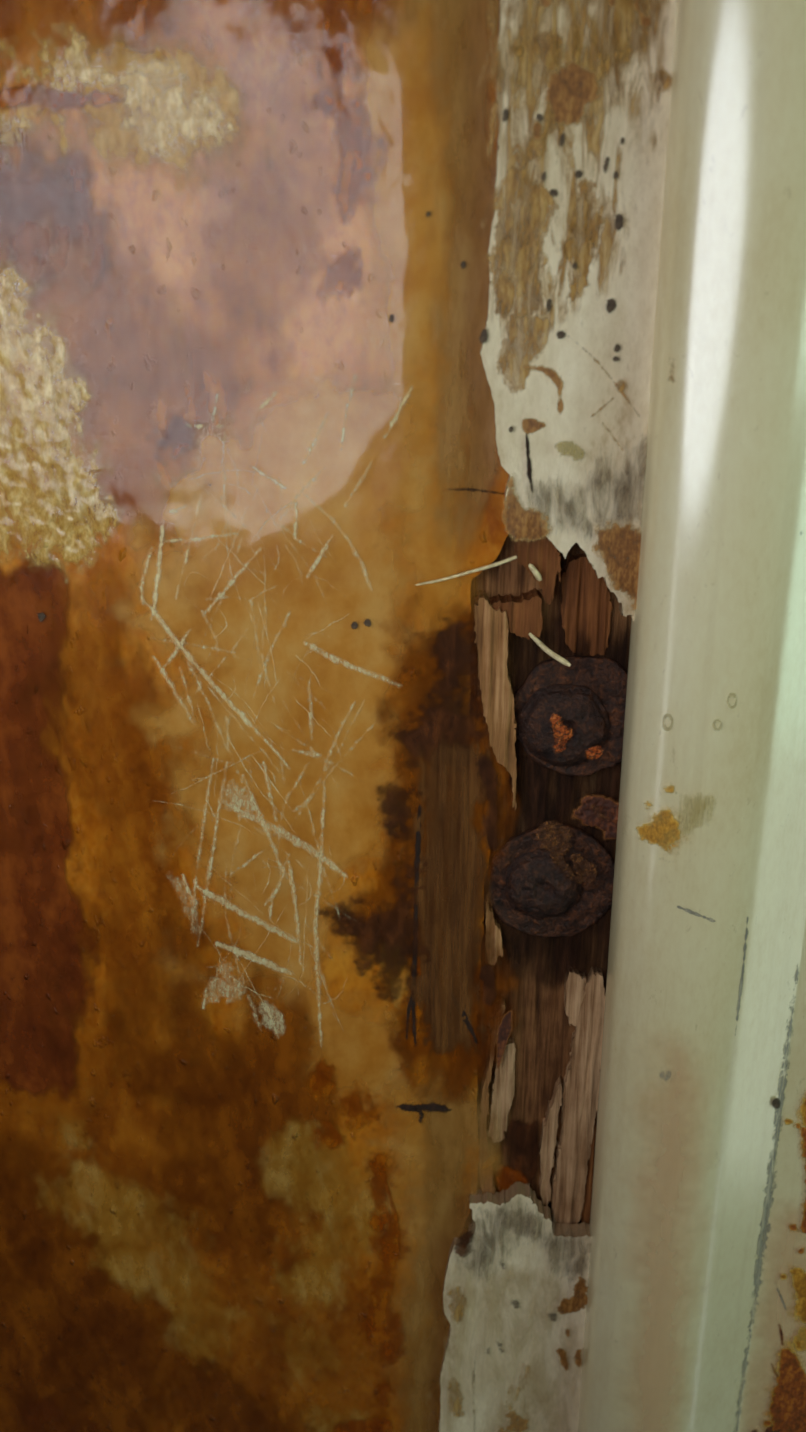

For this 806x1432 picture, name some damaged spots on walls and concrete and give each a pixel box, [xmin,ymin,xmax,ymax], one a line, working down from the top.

rust [536,795,619,884]
rust [636,801,680,851]
rust [752,1097,806,1432]